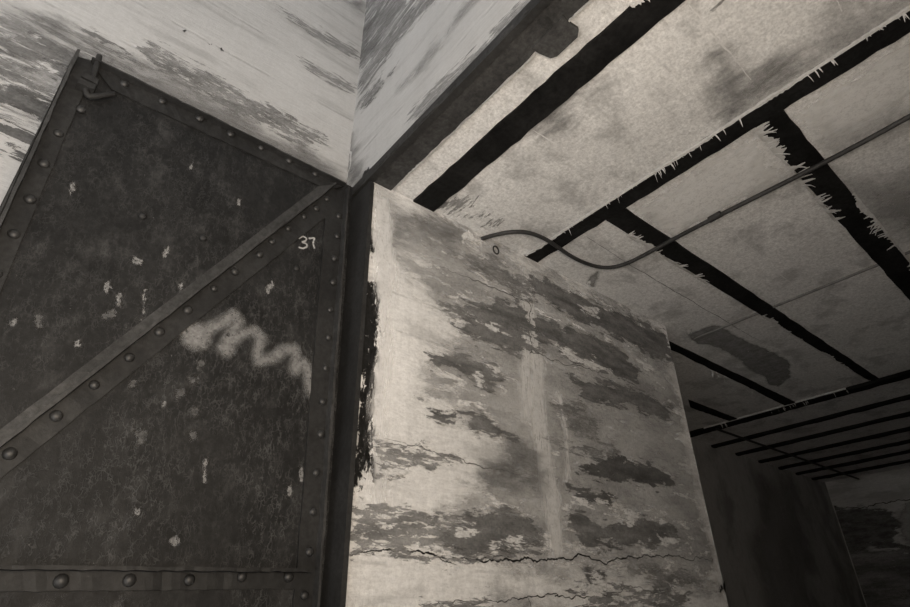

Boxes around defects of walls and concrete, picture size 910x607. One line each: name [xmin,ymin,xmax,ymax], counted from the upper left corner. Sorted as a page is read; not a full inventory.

peeling [0,14,328,162]
peeling [360,67,395,108]
damp [525,5,910,256]
damp [689,326,790,386]
damp [483,269,562,558]
peeling [349,195,713,607]
damp [703,388,849,429]
crack [352,548,713,565]
crack [418,586,674,606]